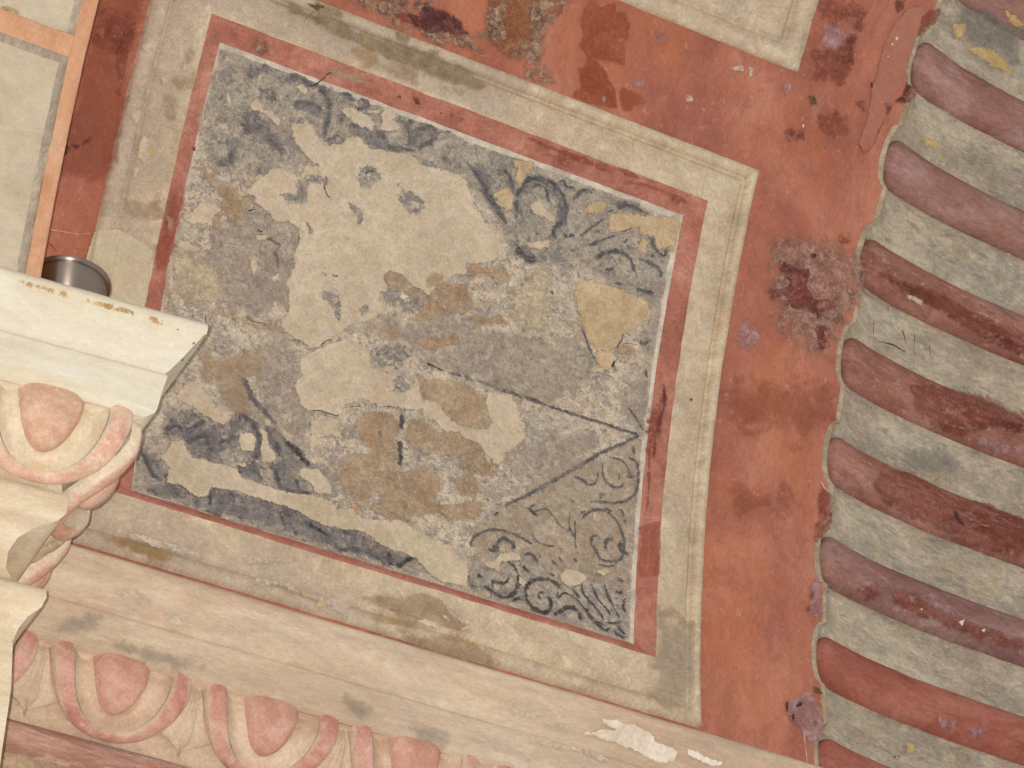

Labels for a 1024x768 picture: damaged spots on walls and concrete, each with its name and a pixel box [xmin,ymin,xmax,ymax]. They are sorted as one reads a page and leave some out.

peeling [277,2,485,90]
spalling [896,83,916,103]
peeling [133,135,156,177]
peeling [581,199,681,253]
spalling [87,298,134,315]
peeling [157,96,649,587]
peeling [127,530,203,558]
peeling [365,593,471,634]
peeling [584,719,723,766]
spalling [786,692,827,763]